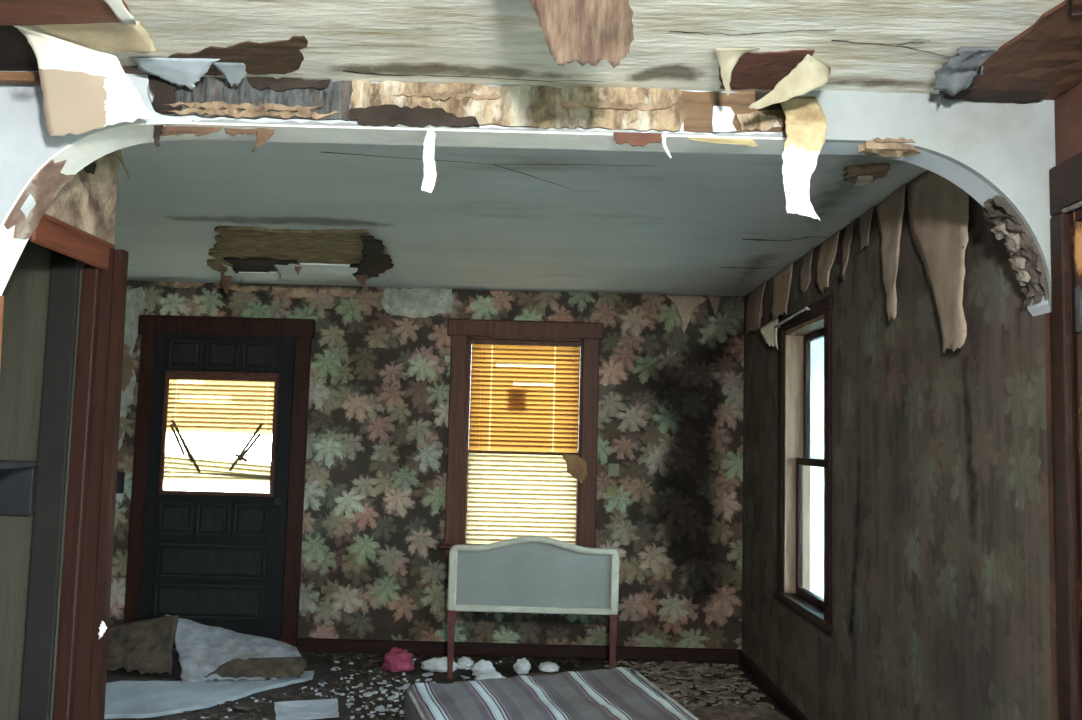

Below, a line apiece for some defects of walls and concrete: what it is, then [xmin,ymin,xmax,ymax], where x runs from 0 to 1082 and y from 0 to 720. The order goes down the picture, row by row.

flaking render [0,0,136,85]
spalling [148,75,786,193]
flaking render [4,149,130,244]
spalling [207,226,394,294]
flaking render [381,288,454,317]
spalling [983,195,1049,305]